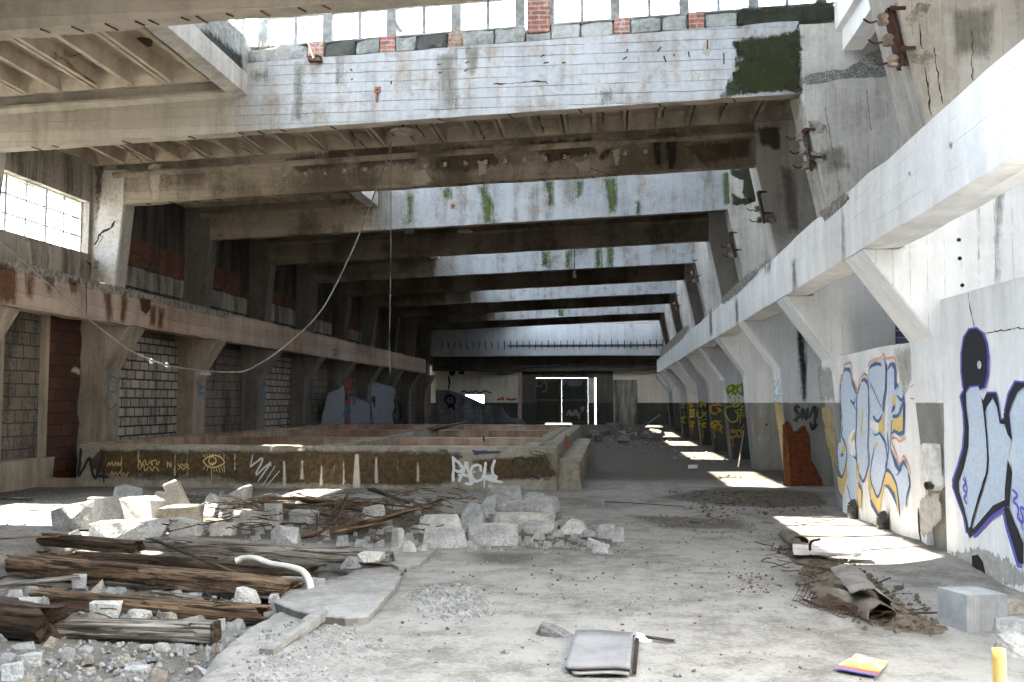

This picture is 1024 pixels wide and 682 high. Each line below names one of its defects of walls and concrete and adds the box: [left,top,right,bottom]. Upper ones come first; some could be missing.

crack [492,78,548,86]
crack [919,23,943,116]
crack [94,220,115,245]
rust [0,265,33,303]
rust [104,293,127,322]
rust [140,298,164,329]